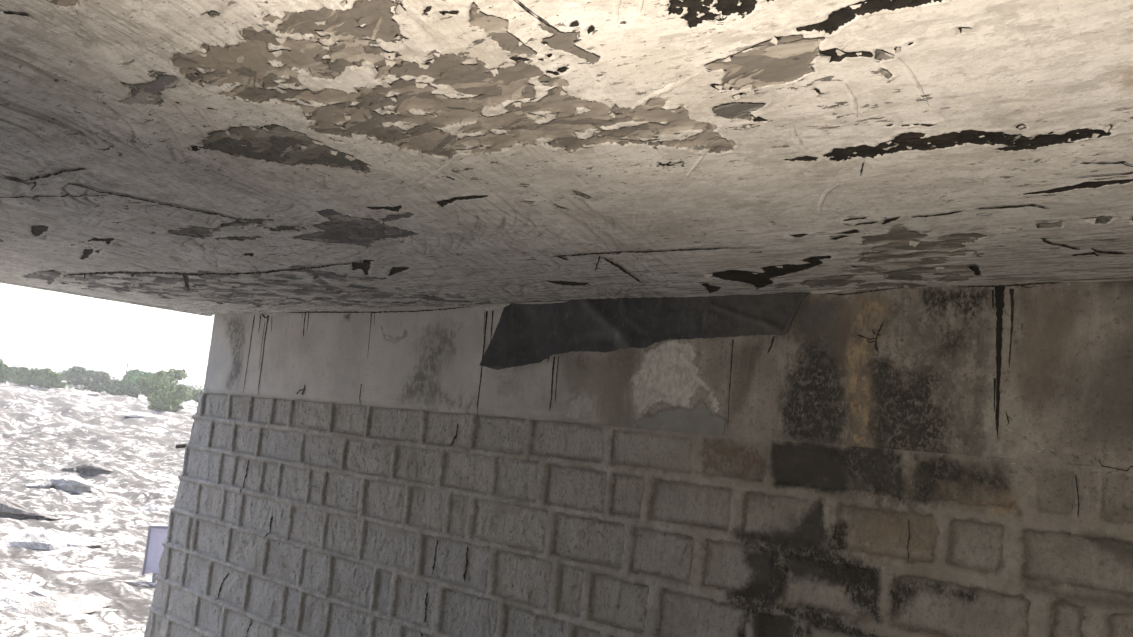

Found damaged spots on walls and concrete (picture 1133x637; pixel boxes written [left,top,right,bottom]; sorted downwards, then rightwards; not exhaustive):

peeling [119,0,952,174]
peeling [784,124,1110,162]
peeling [1023,179,1133,195]
peeling [1009,221,1063,231]
peeling [1082,216,1112,224]
peeling [23,205,493,308]
peeling [701,217,987,293]
water stain [923,287,994,320]
water stain [728,295,1008,637]